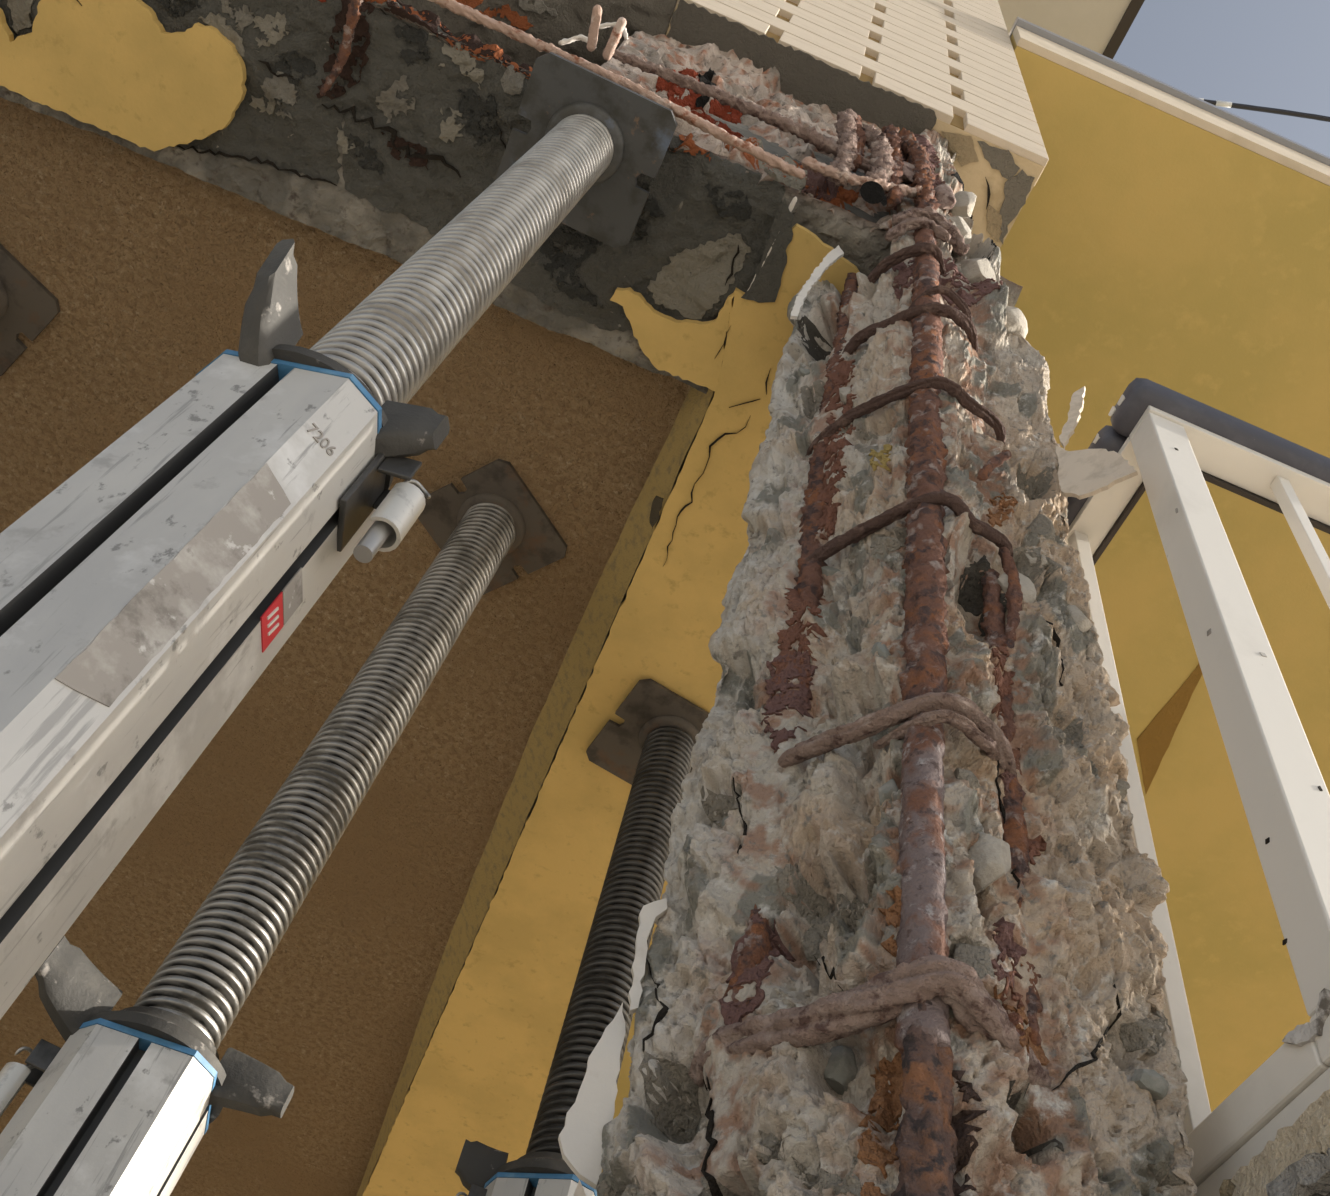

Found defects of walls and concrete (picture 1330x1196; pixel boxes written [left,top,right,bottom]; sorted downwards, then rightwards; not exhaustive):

spalling [0,0,41,40]
spalling [142,0,979,332]
corrosion [656,67,859,212]
spalling [790,245,858,419]
crack [665,368,771,563]
corrosion [815,357,857,541]
peeling [1016,386,1138,500]
corrosion [760,588,828,754]
spalling [856,227,1007,967]
peeling [558,898,667,1196]
corrosion [951,1070,988,1196]
corrosion [991,917,1050,1066]